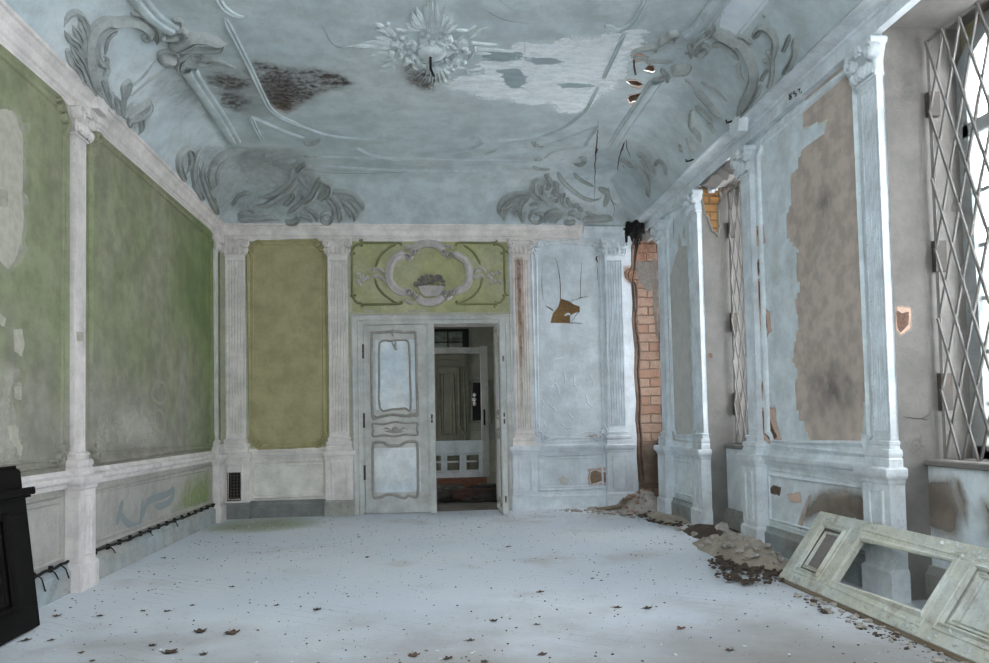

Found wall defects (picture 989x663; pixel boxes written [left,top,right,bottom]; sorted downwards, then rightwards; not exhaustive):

peeling [449,29,650,115]
peeling [0,108,28,270]
flaking render [699,159,736,238]
peeling [0,314,25,356]
spalling [546,261,587,324]
peeling [786,66,865,441]
spalling [896,306,911,335]
spalling [588,468,606,485]